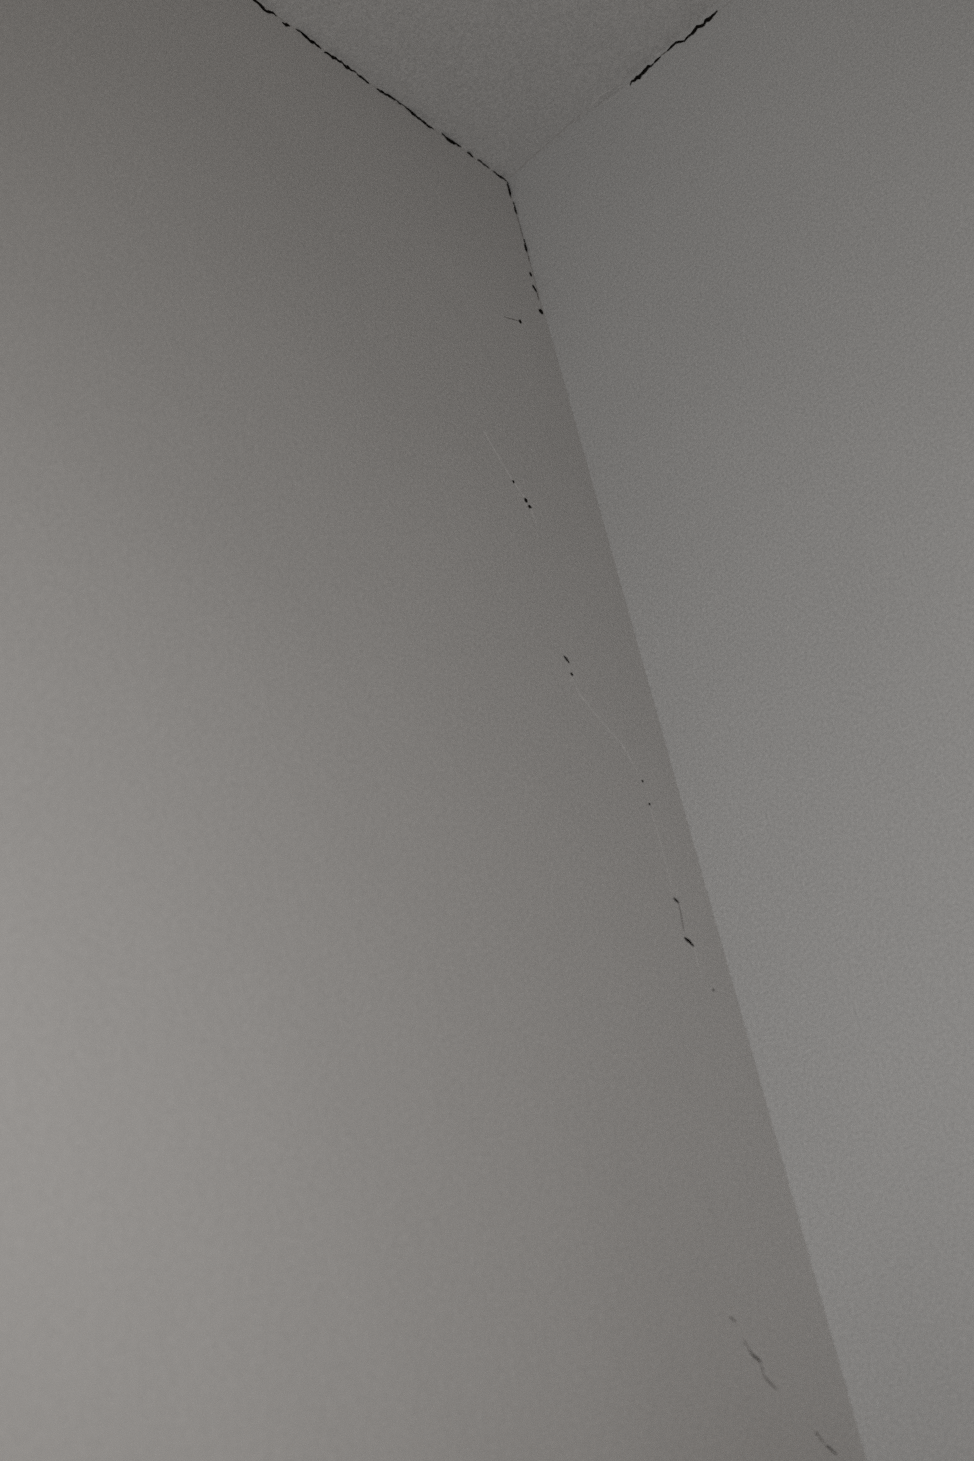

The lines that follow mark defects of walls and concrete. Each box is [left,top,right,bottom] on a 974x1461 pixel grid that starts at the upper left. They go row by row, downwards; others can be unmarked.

crack [253,0,732,323]
crack [729,1316,777,1390]